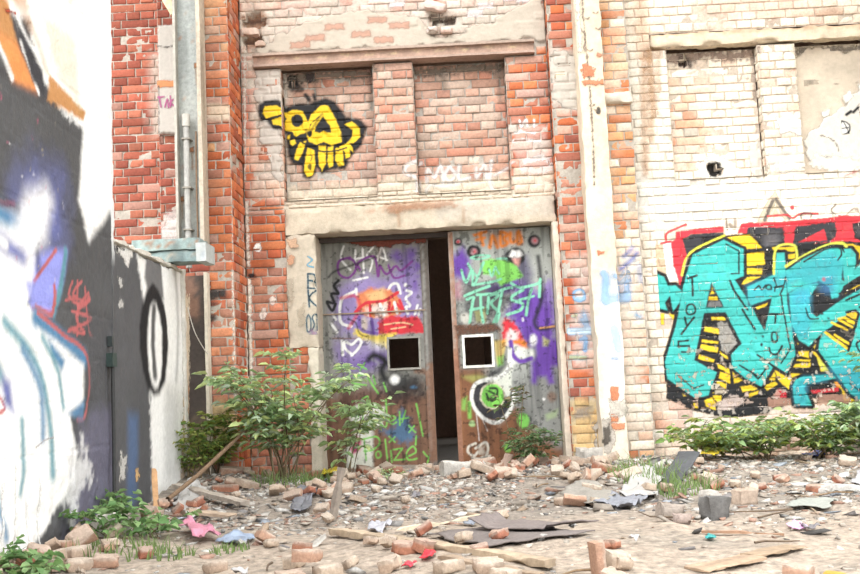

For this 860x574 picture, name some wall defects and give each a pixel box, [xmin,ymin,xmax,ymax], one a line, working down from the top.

spalling [242,14,266,48]
flaking render [290,17,409,49]
spalling [424,0,455,35]
spalling [580,63,604,86]
peeling [748,84,860,176]